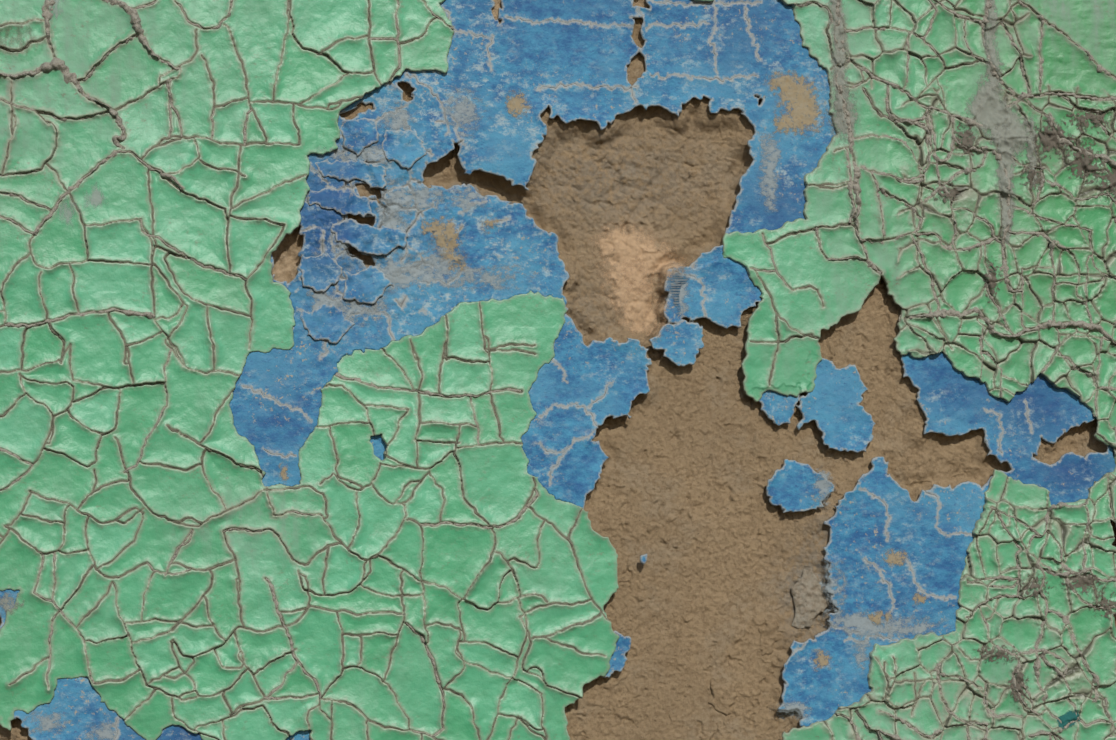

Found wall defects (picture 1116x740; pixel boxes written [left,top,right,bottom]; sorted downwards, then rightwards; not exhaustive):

peeling [0,0,923,610]
peeling [0,184,1116,740]
crack [651,2,716,79]
crack [750,0,1116,452]
crack [837,474,1116,740]
peeling [841,0,1116,344]